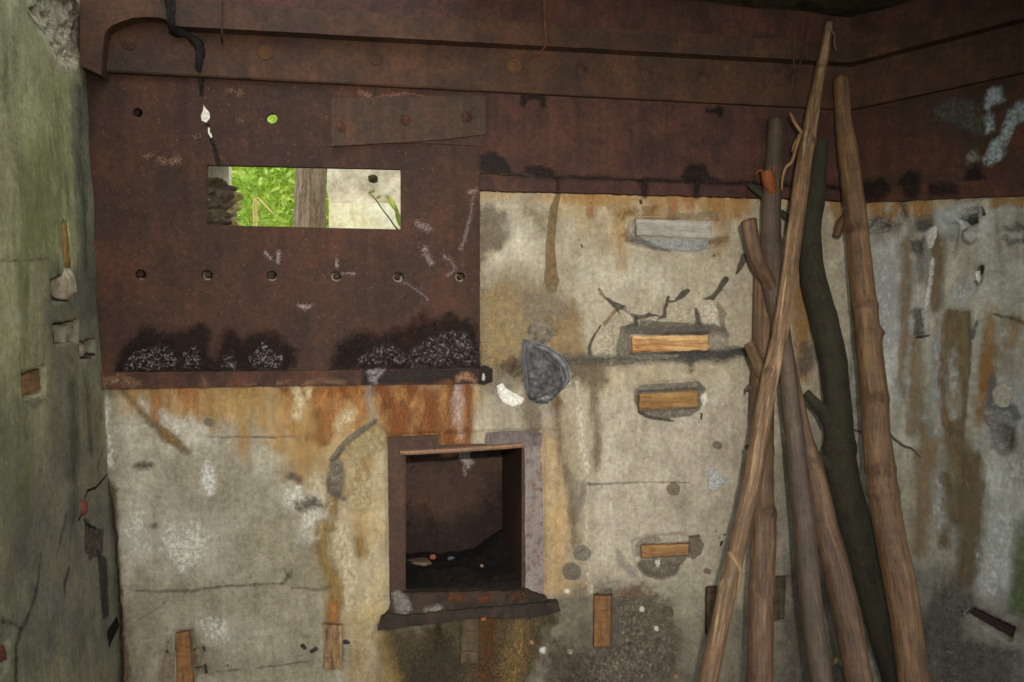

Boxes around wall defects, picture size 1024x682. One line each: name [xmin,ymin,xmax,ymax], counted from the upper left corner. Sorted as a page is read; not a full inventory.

rust [103,314,479,474]
crack [588,253,747,356]
rust [794,260,815,379]
damp [877,204,1024,597]
rust [976,312,1020,421]